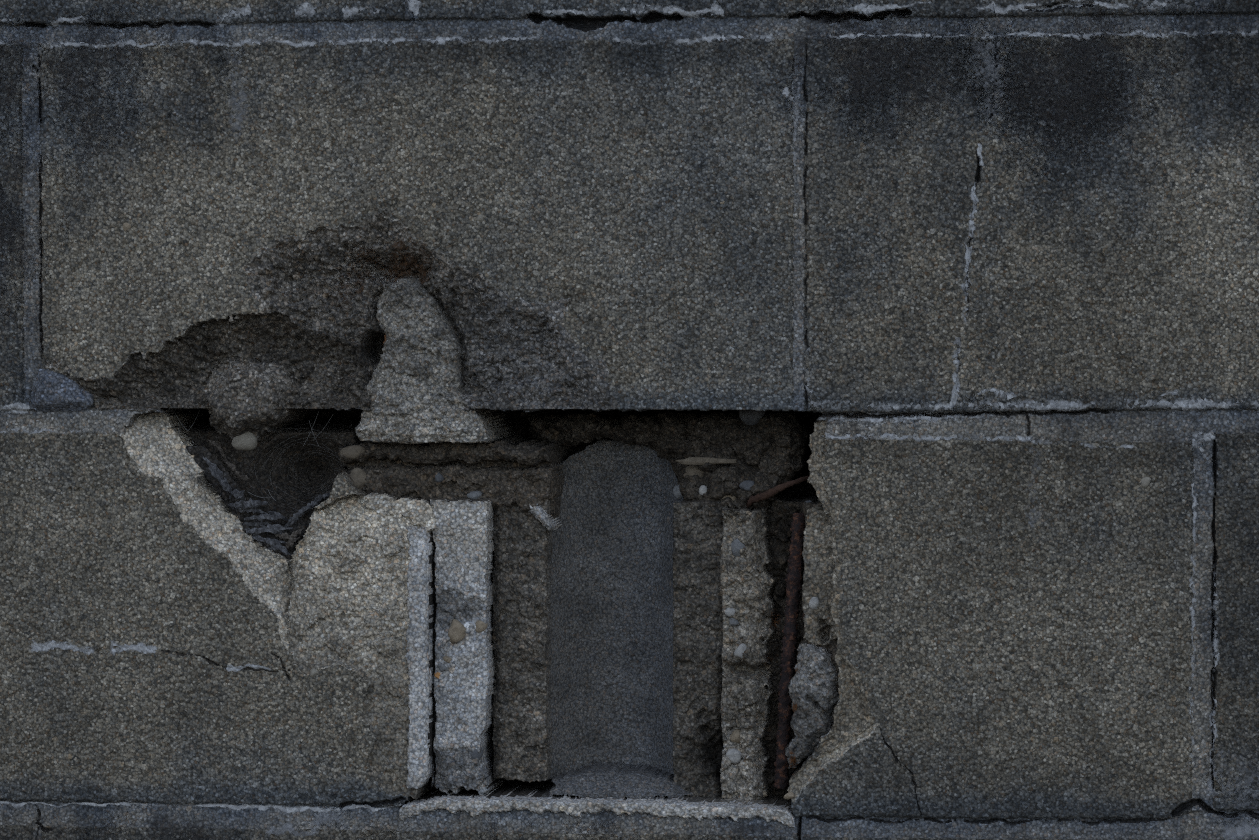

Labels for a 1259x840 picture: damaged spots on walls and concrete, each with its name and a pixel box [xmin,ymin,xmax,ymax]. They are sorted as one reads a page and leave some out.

crack [990,11,998,120]
crack [953,149,982,410]
spalling [45,208,618,809]
crack [161,650,291,681]